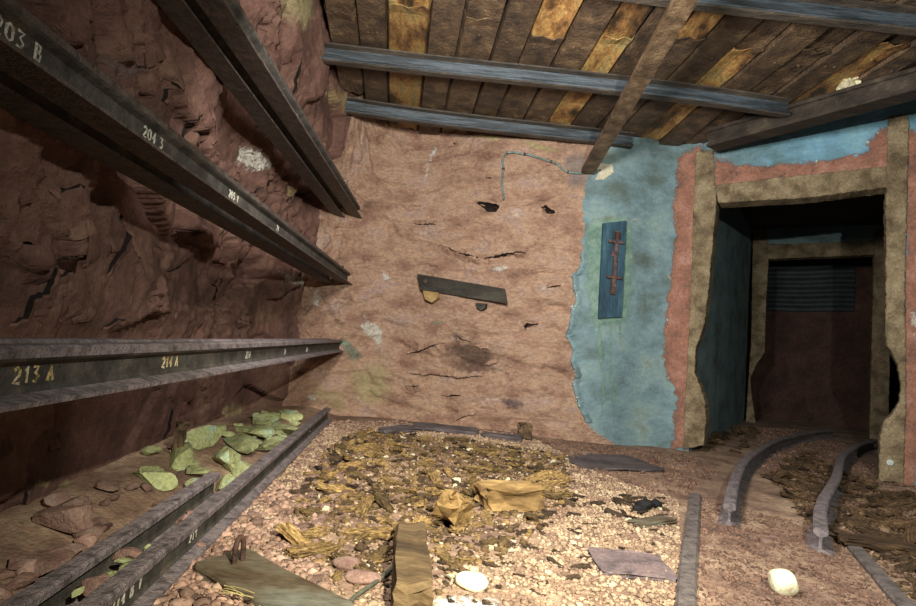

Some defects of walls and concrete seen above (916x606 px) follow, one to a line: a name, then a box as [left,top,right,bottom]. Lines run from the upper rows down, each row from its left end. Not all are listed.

flaking render [714,126,888,185]
crack [404,205,561,288]
peeling [564,253,592,423]
flaking render [662,146,702,449]
flaking render [904,129,916,486]